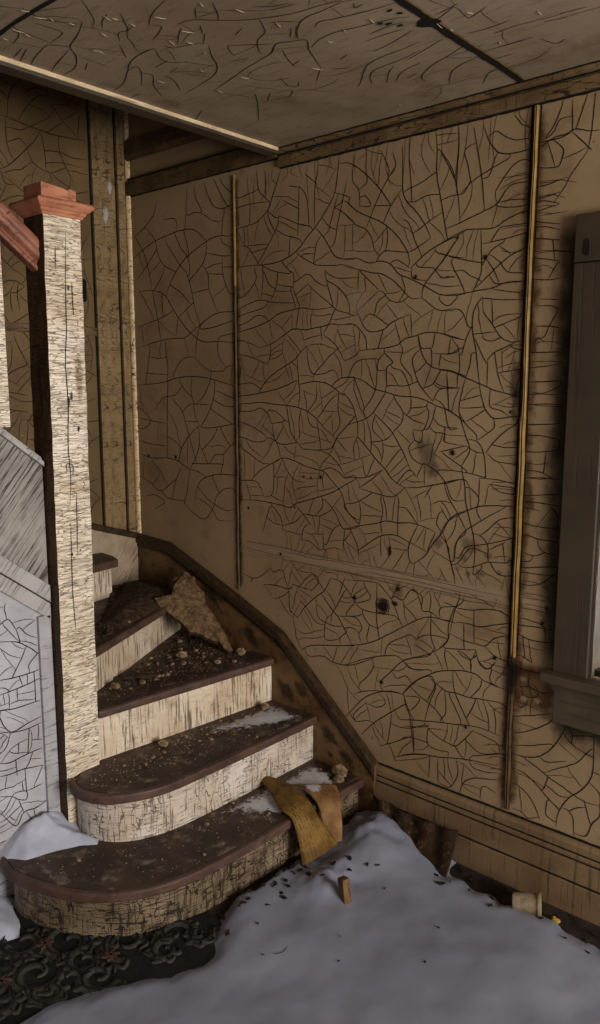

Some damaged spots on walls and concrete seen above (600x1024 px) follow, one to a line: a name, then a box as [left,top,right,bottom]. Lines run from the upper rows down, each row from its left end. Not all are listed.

crack [0,0,586,120]
crack [0,114,86,185]
crack [2,280,28,413]
crack [133,92,600,837]
crack [0,619,44,826]